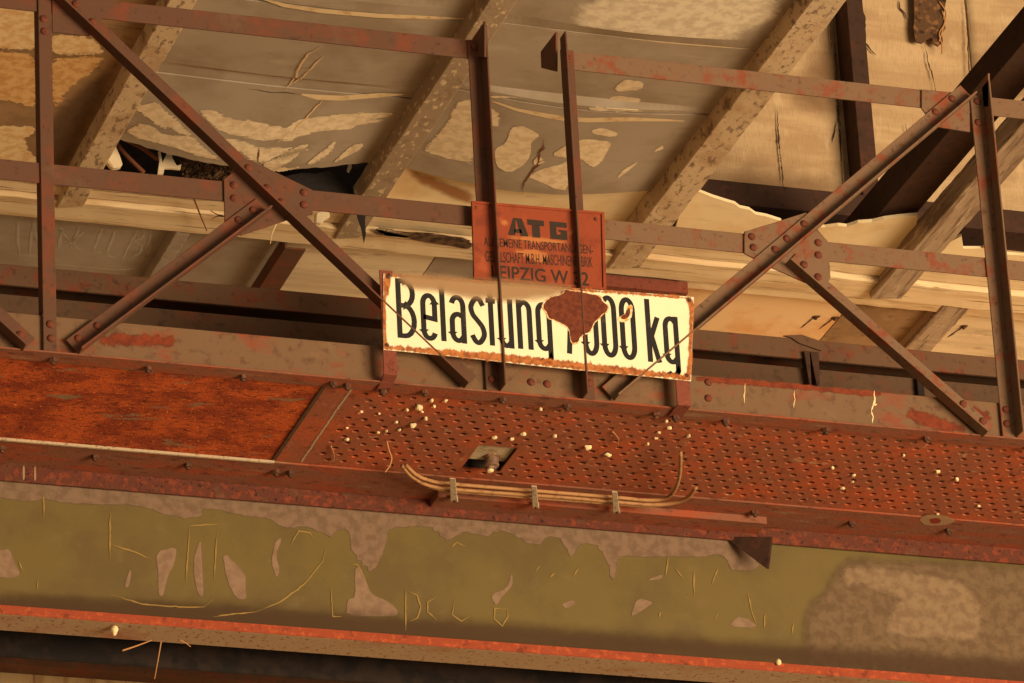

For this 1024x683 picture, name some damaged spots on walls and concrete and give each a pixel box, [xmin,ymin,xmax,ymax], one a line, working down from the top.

peeling [588,80,643,112]
peeling [127,102,220,175]
peeling [201,110,393,172]
peeling [424,100,473,164]
peeling [495,126,568,190]
crack [522,139,546,193]
peeling [579,128,617,167]
rust [101,333,175,347]
rust [907,408,965,432]
peeling [0,481,759,617]
rust [920,514,955,525]
water stain [843,567,982,641]